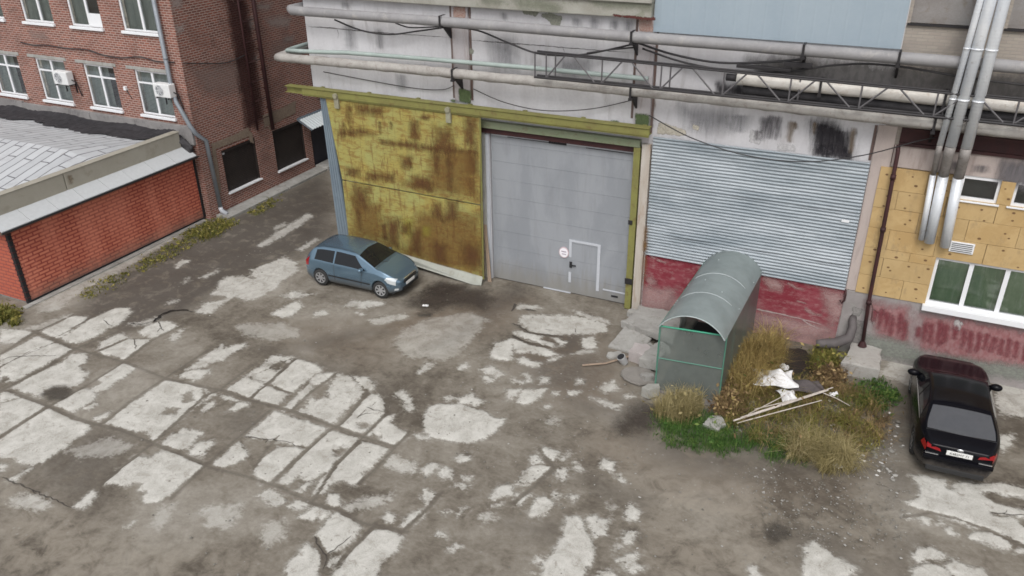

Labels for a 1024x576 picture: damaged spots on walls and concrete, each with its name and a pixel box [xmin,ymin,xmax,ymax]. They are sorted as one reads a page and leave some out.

corrosion [382,116,475,181]
damp [756,117,780,138]
damp [814,120,852,159]
corrosion [354,188,480,270]
peeling [642,278,675,310]
crack [104,309,193,349]
peeling [755,277,1024,379]